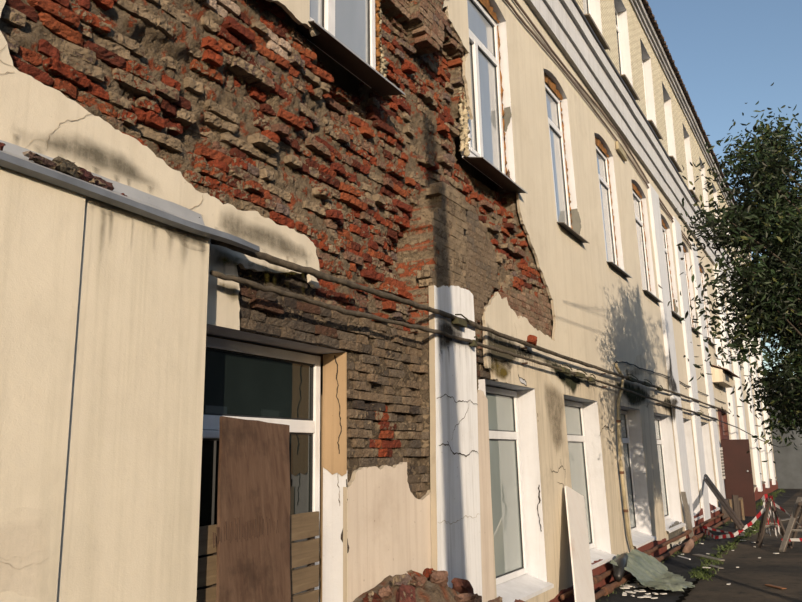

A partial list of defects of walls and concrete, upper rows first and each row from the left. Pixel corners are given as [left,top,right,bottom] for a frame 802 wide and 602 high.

spalling [0,0,553,503]
crack [438,394,478,457]
damp [488,327,596,393]
damp [547,390,562,443]
damp [617,372,650,405]
damp [660,350,677,421]
crack [537,466,566,531]